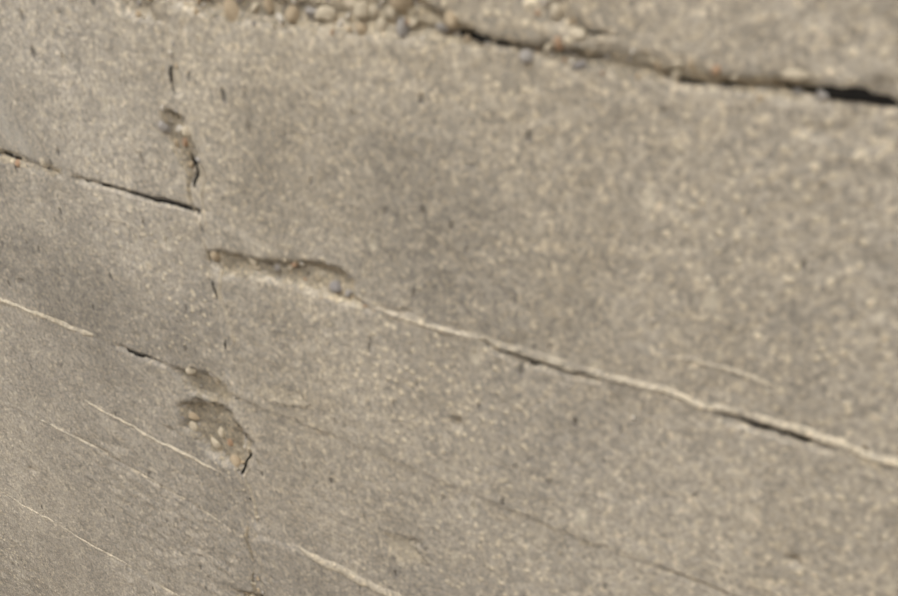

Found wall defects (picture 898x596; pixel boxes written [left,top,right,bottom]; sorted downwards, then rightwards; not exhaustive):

spalling [165,0,496,48]
crack [460,30,511,45]
spalling [510,0,828,101]
crack [679,77,747,86]
crack [781,83,898,108]
crack [507,351,585,375]
peeling [258,386,308,407]
spalling [174,367,253,470]
crack [736,416,812,441]